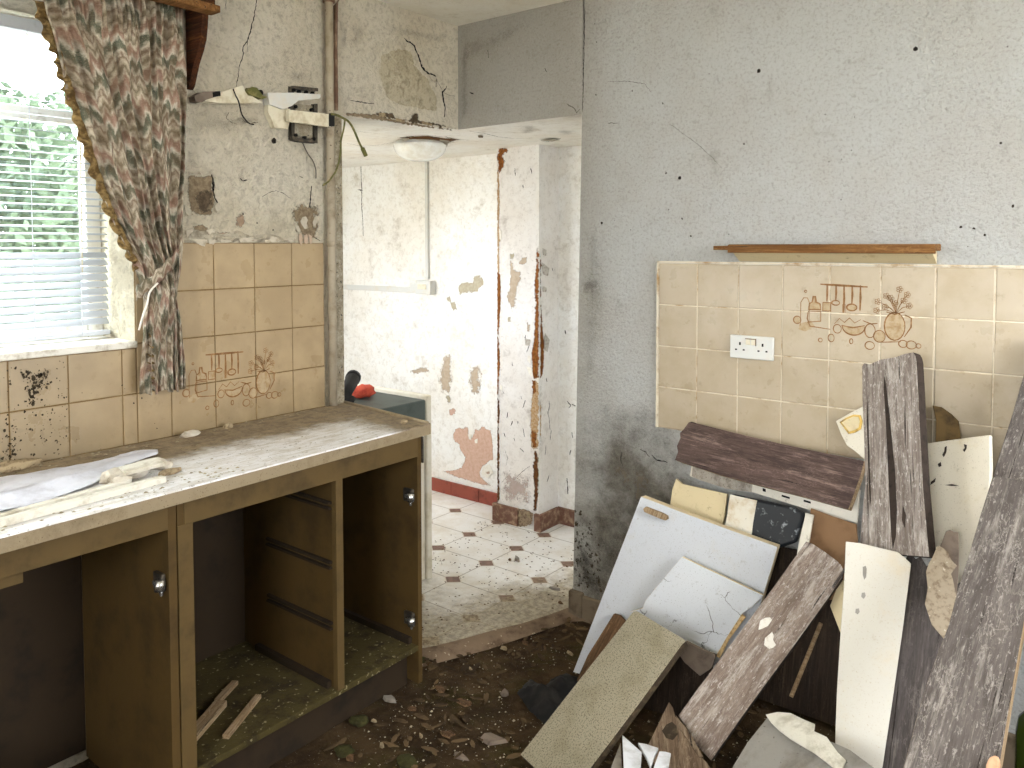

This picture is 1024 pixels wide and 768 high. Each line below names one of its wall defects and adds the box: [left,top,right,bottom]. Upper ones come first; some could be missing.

crack [236,0,257,86]
crack [404,38,506,140]
crack [568,9,585,113]
flaking render [184,171,320,246]
peeling [447,276,484,311]
corrosion [497,148,508,503]
peeling [507,254,527,322]
damp [0,362,77,461]
peeling [468,367,481,394]
corrosion [525,249,550,511]
peeling [446,427,533,527]
damp [574,431,675,600]